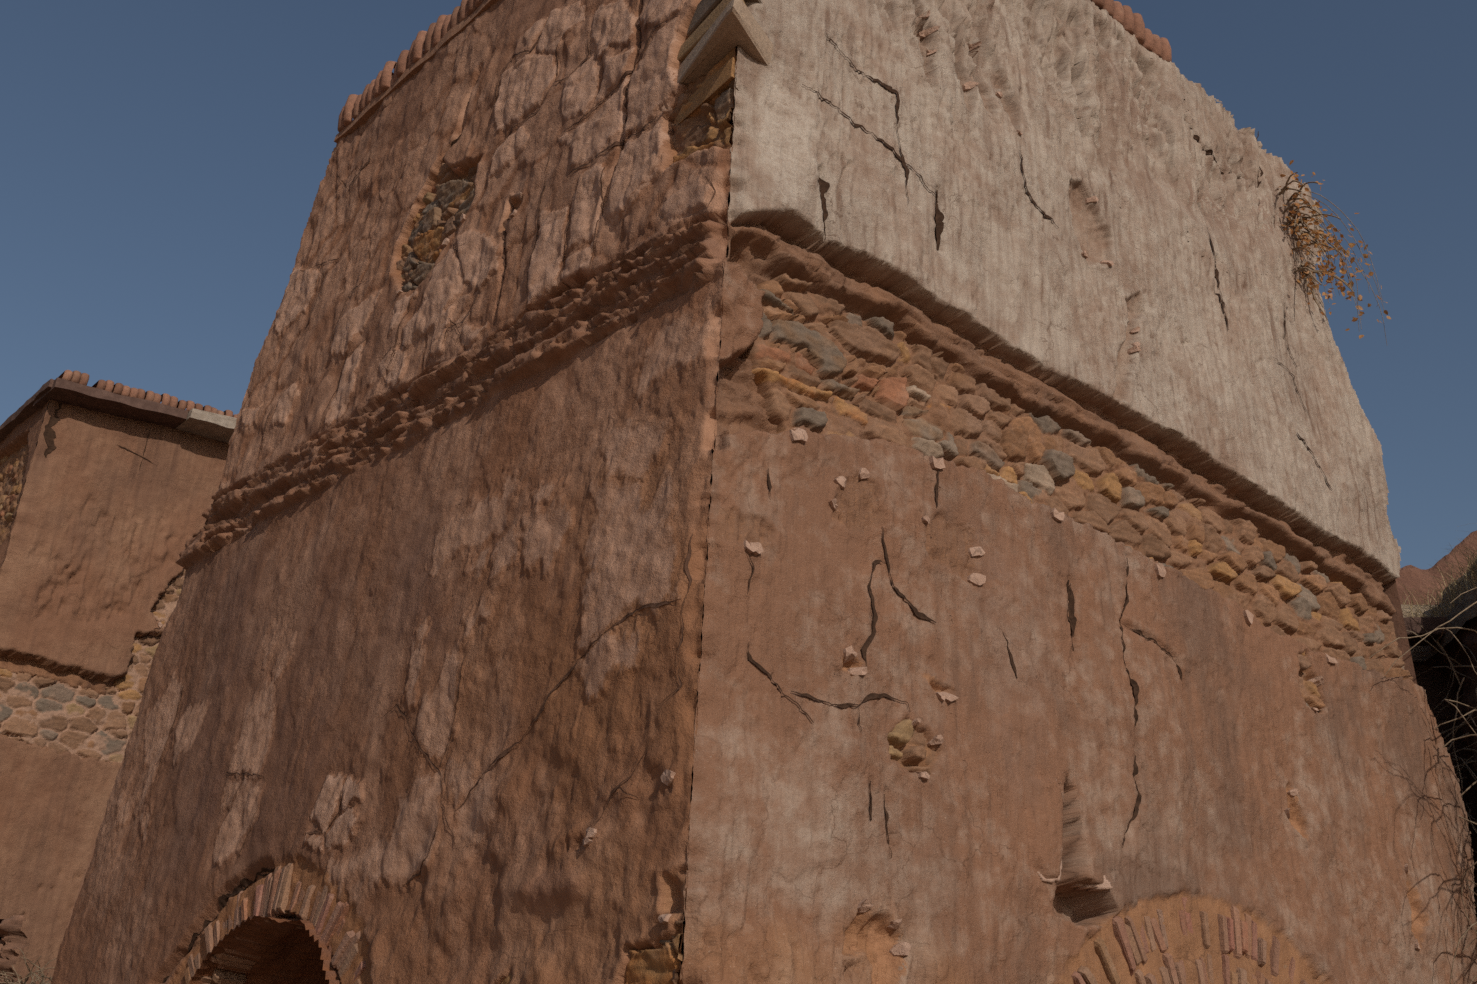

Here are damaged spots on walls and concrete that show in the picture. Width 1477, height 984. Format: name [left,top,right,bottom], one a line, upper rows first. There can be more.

crack [442,0,680,344]
spalling [0,443,38,549]
crack [44,402,62,457]
spalling [0,569,212,849]
peeling [303,296,721,903]
crack [382,534,693,886]
spalling [887,718,944,780]
crack [1003,633,1018,678]
crack [1067,580,1077,651]
spalling [739,273,1413,714]
crack [1119,560,1183,846]
spalling [625,860,687,984]